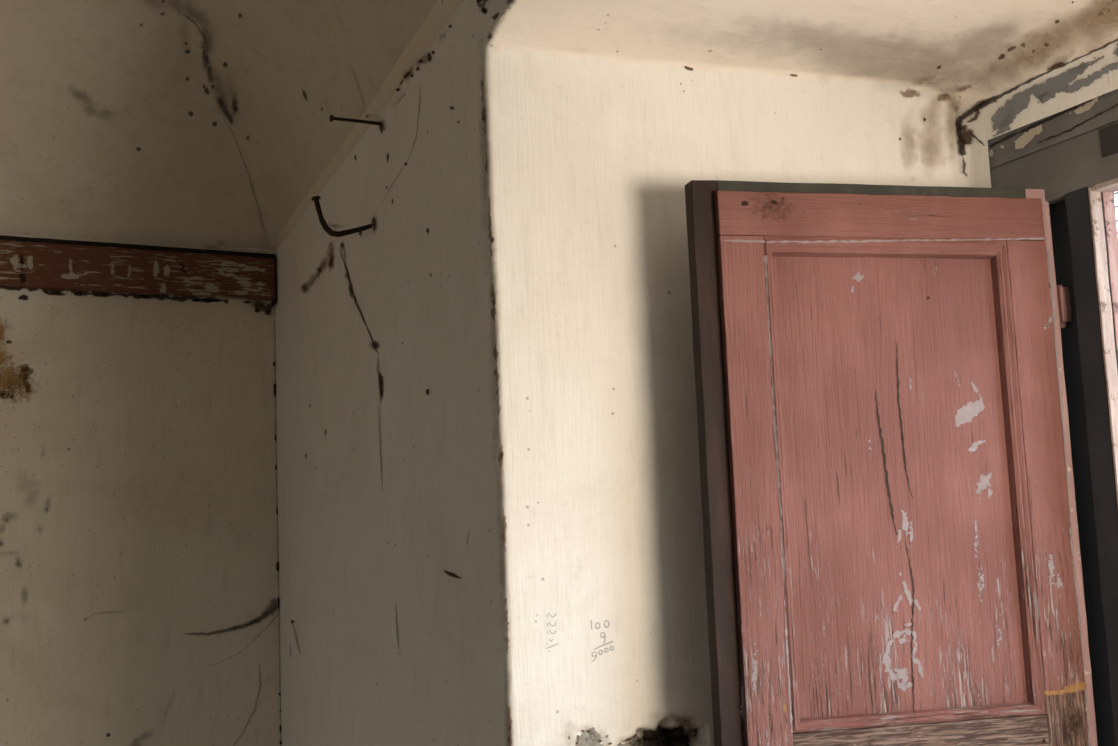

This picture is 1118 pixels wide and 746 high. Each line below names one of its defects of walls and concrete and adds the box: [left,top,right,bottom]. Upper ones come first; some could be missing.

water stain [998,0,1118,64]
peeling [961,43,1118,157]
flaking render [0,286,228,304]
flaking render [243,300,273,315]
crack [339,247,383,397]
corrosion [0,325,37,402]
spalling [568,718,696,746]